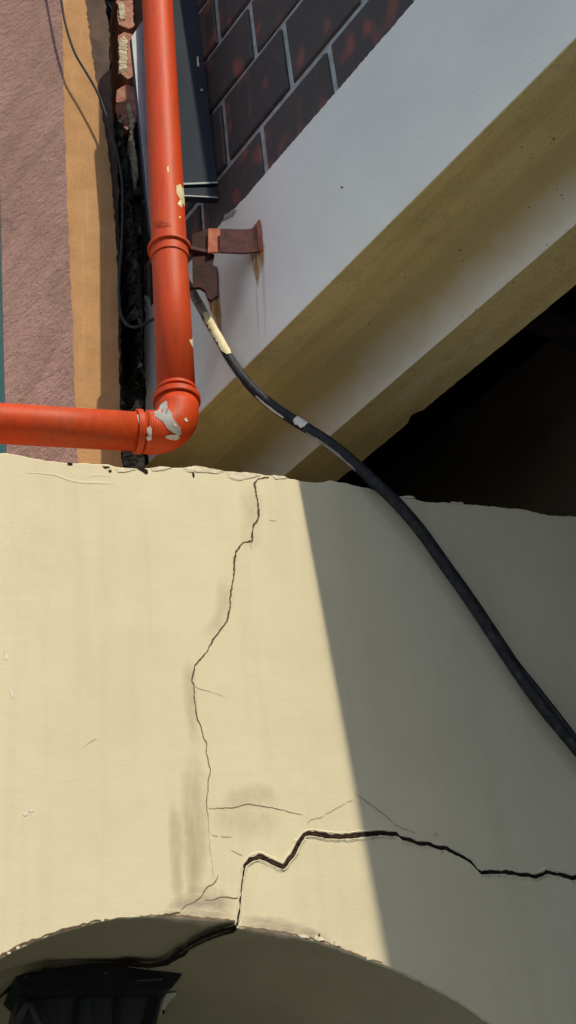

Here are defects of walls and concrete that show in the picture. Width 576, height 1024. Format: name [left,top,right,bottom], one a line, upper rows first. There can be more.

rust [252,249,264,281]
rust [209,299,221,331]
crack [0,477,576,998]